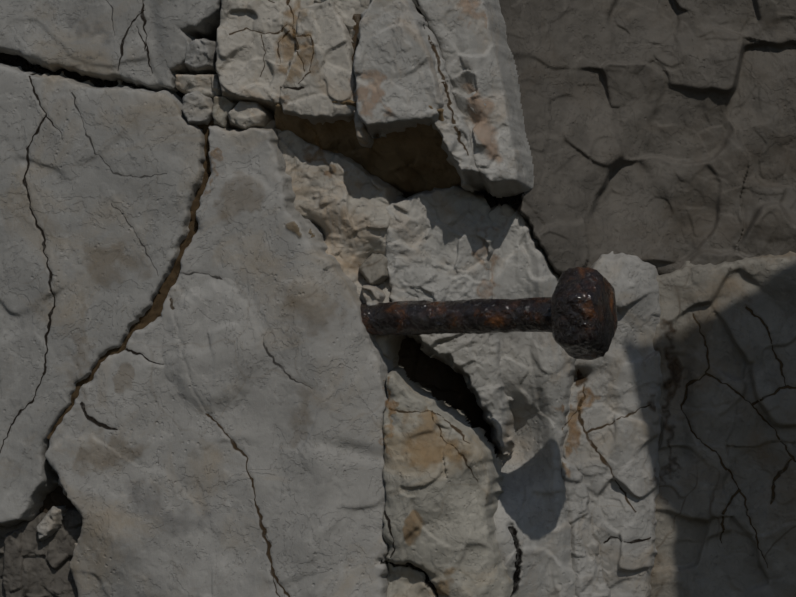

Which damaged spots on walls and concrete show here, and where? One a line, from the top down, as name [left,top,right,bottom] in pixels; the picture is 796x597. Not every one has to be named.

crack [0,1,185,453]
crack [47,121,222,440]
crack [263,342,313,389]
crack [205,413,290,597]
crack [508,526,523,597]
crack [562,386,650,512]
crack [604,535,651,543]